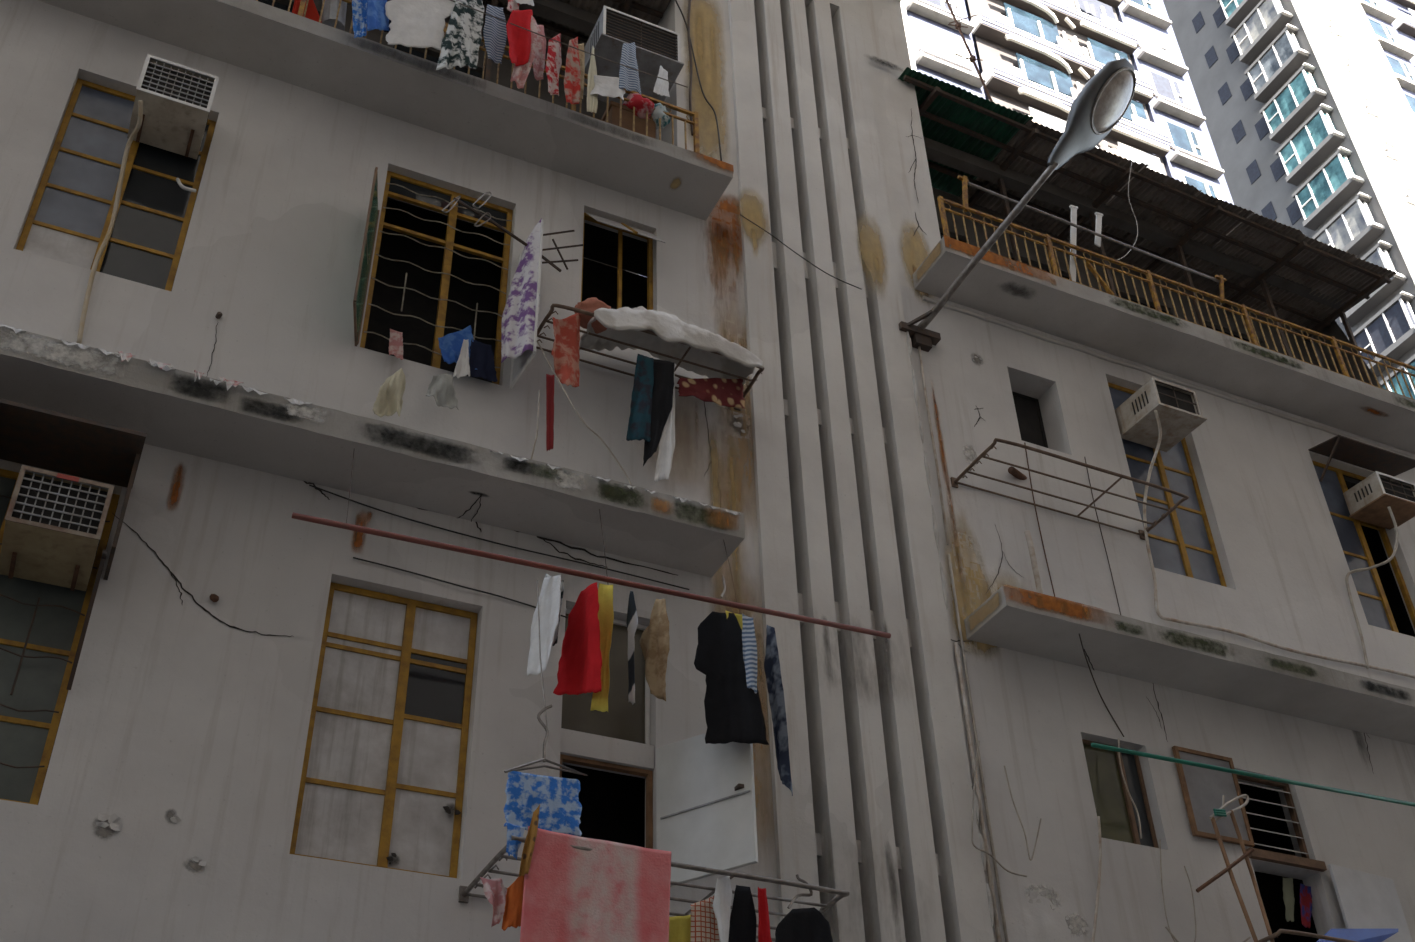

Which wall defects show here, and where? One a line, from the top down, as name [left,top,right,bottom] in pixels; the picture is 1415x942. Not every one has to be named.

rust [710,198,743,292]
damp [173,376,226,400]
damp [243,399,295,420]
damp [368,426,467,462]
damp [505,458,535,473]
rust [1009,585,1096,620]